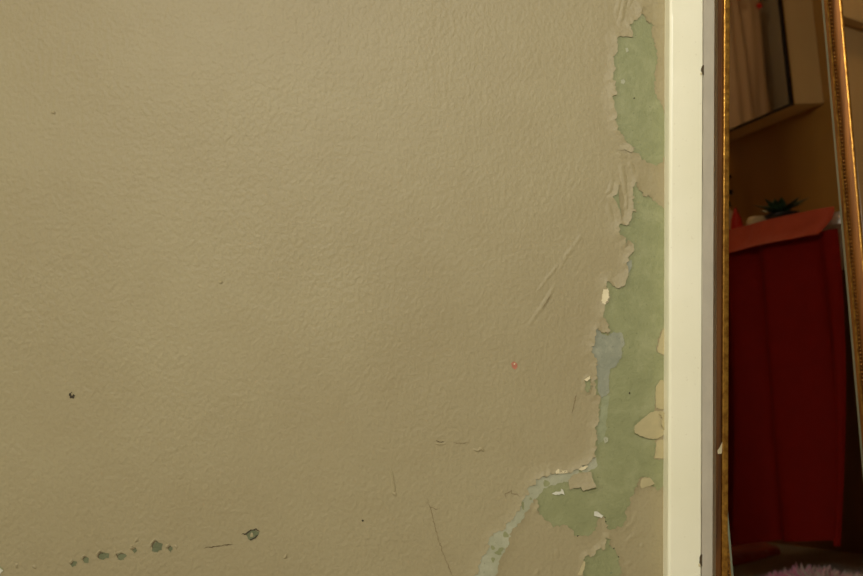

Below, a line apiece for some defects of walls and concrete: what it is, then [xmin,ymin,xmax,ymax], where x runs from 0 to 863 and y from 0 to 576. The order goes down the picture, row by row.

peeling [242,528,260,540]
peeling [463,0,665,576]